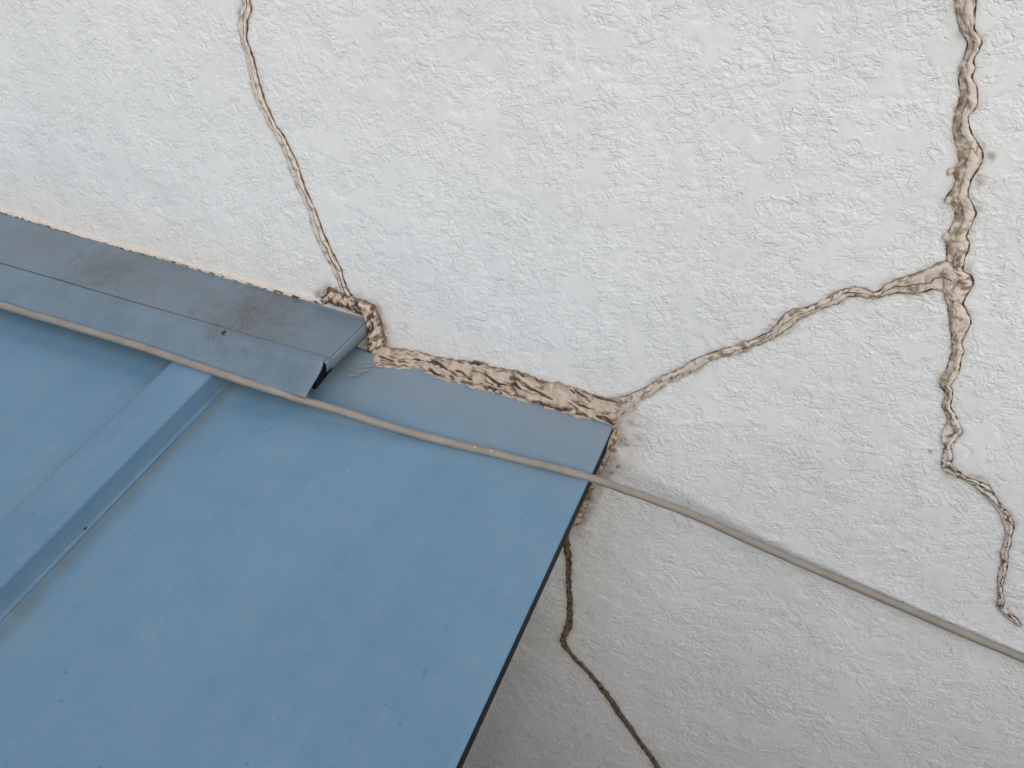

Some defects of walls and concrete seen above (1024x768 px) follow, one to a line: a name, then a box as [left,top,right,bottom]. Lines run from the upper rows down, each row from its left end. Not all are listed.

crack [237,0,384,352]
crack [608,0,1022,626]
crack [559,535,661,768]